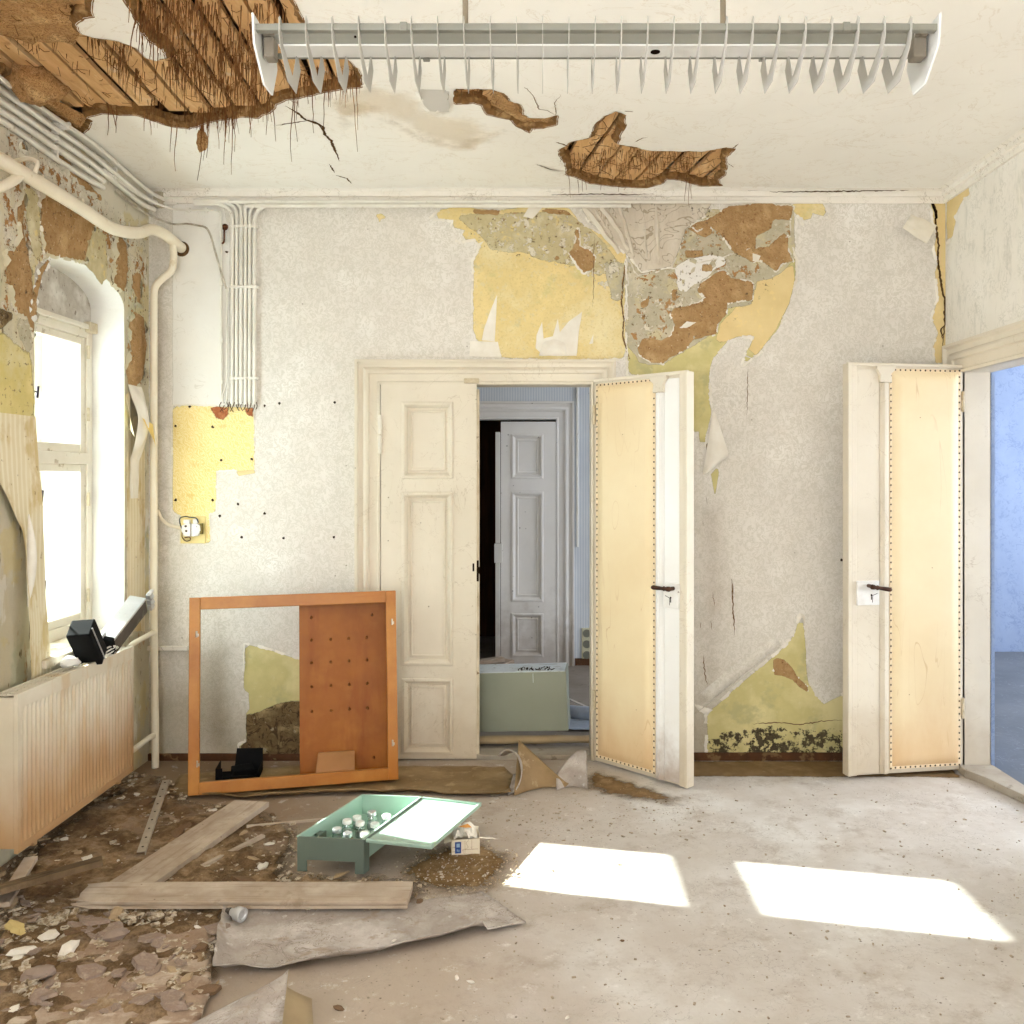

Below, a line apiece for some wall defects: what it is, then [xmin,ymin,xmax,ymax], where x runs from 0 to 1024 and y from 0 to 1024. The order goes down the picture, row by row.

crack [276,106,352,184]
flaking render [0,117,149,416]
flaking render [459,203,795,366]
crack [934,204,946,346]
flaking render [772,658,809,691]
flaking render [241,701,300,760]
water stain [708,720,843,752]